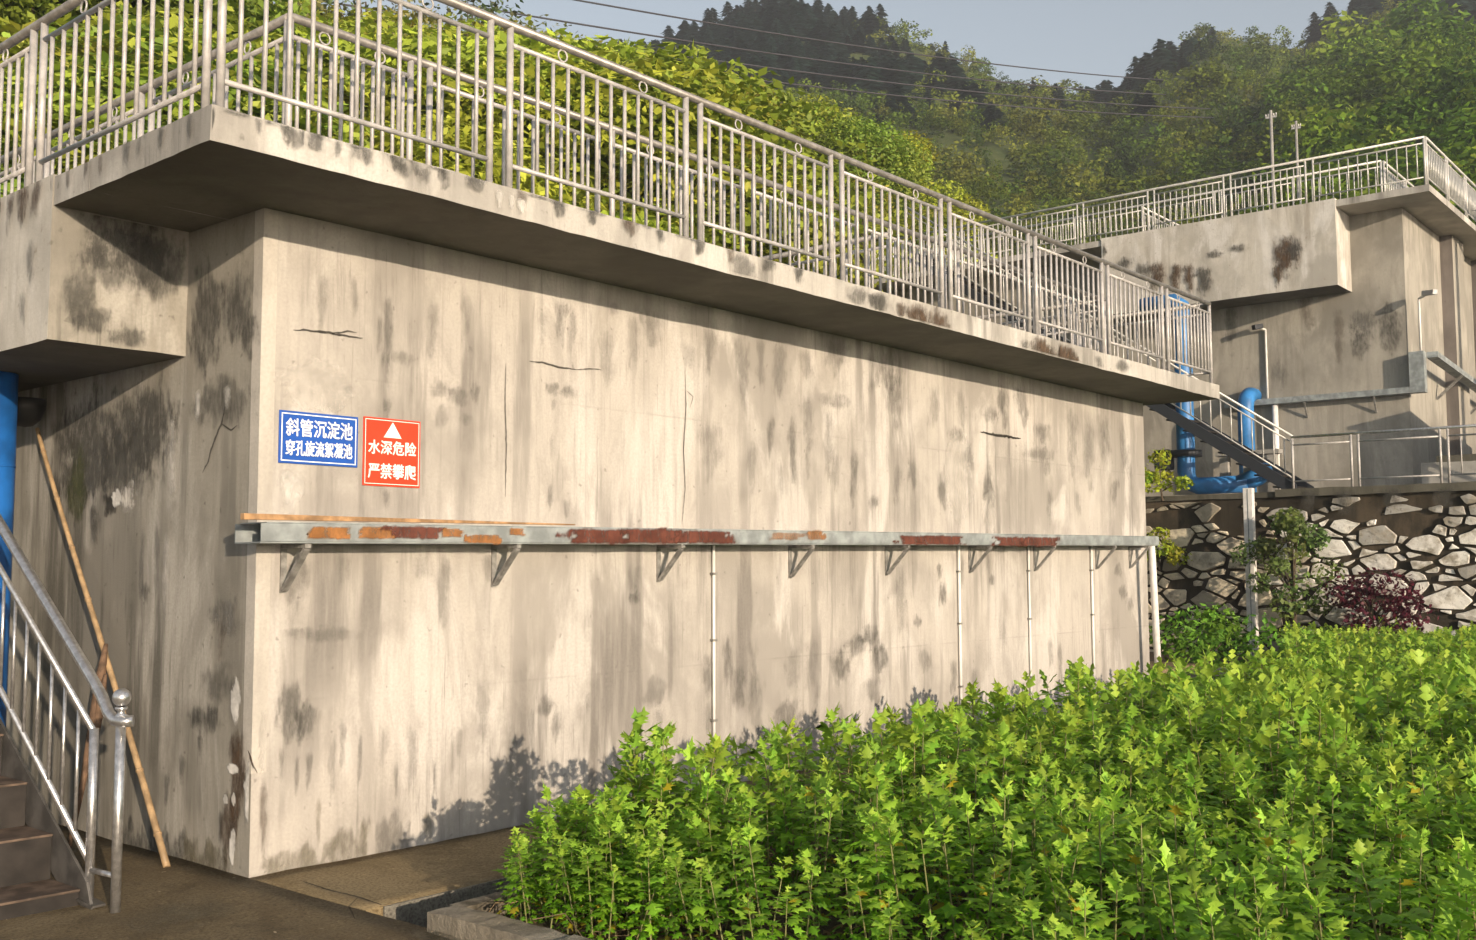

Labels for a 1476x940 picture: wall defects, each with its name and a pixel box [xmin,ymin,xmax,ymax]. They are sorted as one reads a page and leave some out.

damp [67,215,254,372]
crack [296,329,359,338]
crack [505,361,600,496]
crack [981,431,1021,439]
damp [53,388,176,538]
rust [309,526,525,544]
rust [556,528,735,545]
rust [893,535,965,545]
rust [992,536,1060,547]